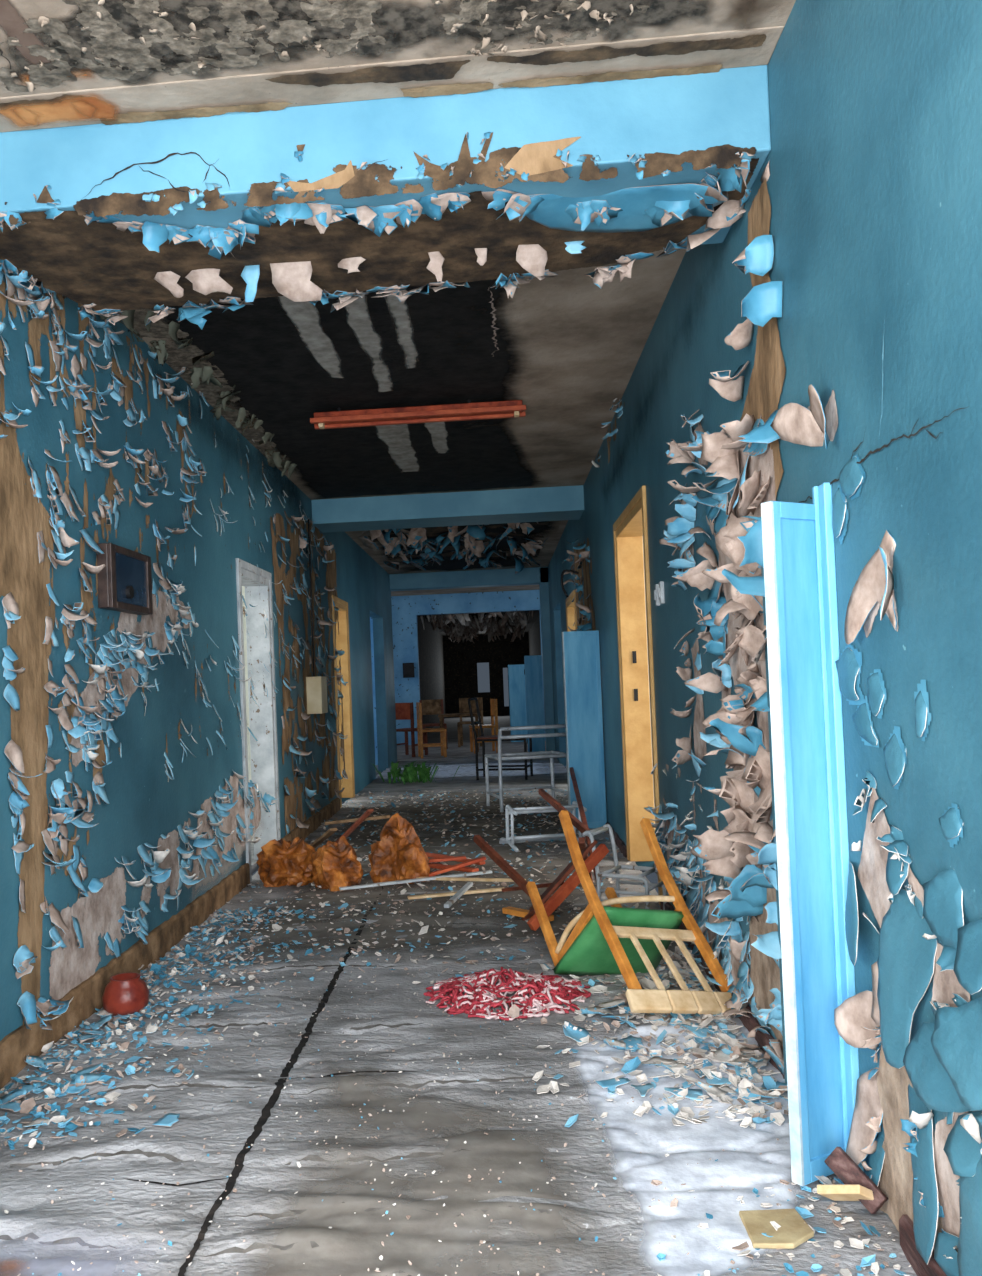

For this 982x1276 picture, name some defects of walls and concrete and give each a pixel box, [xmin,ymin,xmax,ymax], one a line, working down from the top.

damp [0,0,710,85]
peeling [0,0,767,110]
damp [729,0,763,26]
flaking render [100,102,293,125]
crack [799,379,969,503]
peeling [0,132,838,1075]
peeling [844,530,898,645]
peeling [834,771,982,1276]
crack [123,887,419,1276]